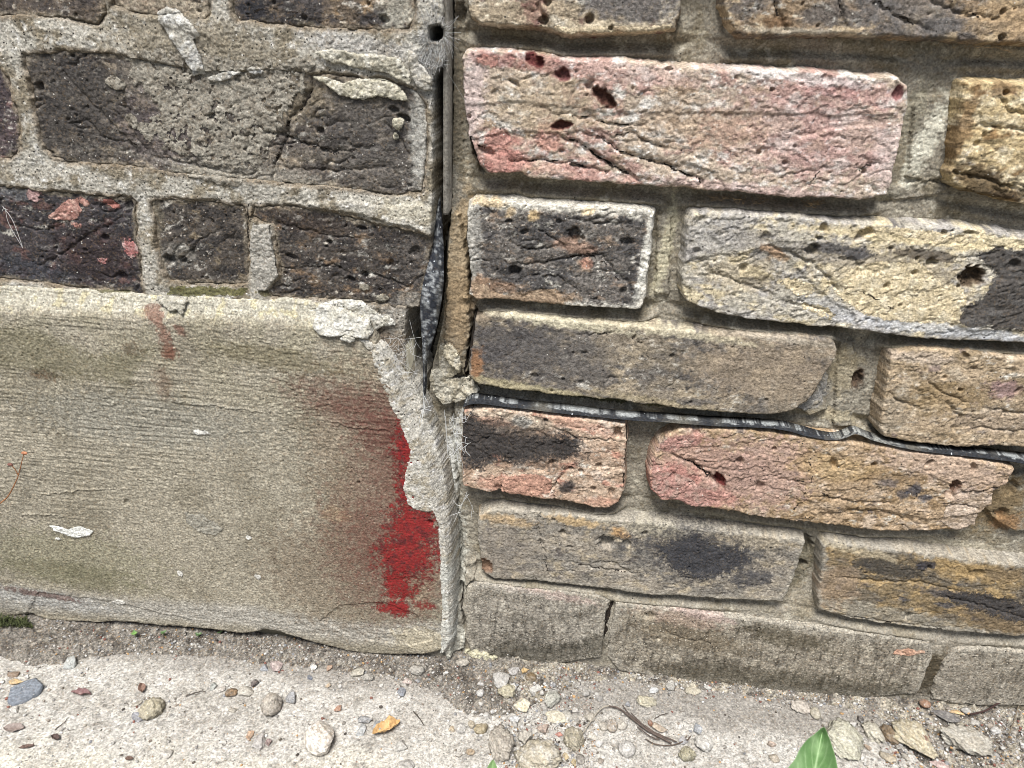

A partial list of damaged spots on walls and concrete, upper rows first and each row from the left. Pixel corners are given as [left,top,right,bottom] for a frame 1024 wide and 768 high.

crack [514,115,701,183]
peeling [381,314,395,326]
crack [603,601,614,637]